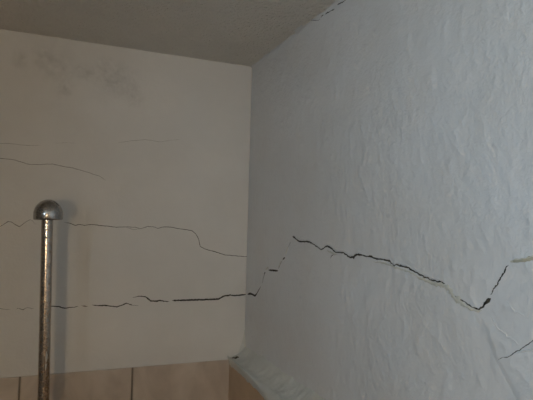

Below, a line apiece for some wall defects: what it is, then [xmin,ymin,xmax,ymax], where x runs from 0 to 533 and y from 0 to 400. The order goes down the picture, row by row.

crack [133,226,247,257]
crack [51,236,507,312]
crack [500,340,533,359]